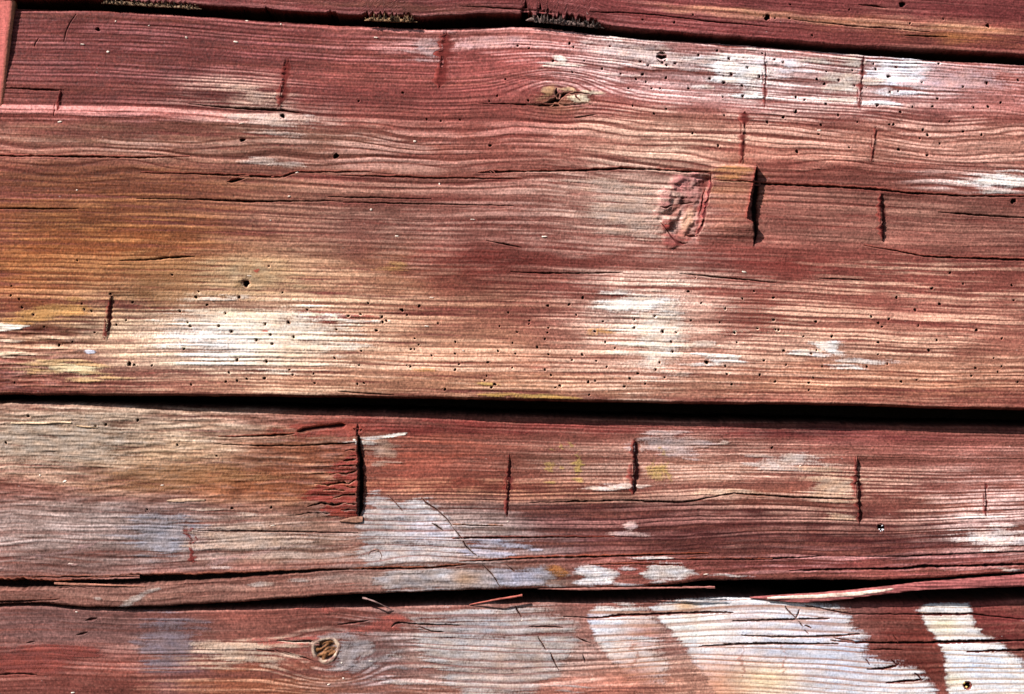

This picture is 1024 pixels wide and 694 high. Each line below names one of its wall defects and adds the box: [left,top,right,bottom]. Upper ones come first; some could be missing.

peeling [105,508,313,561]
crack [0,495,1024,684]
peeling [355,490,695,593]
peeling [582,483,650,491]
crack [529,491,856,505]
peeling [318,597,1024,694]